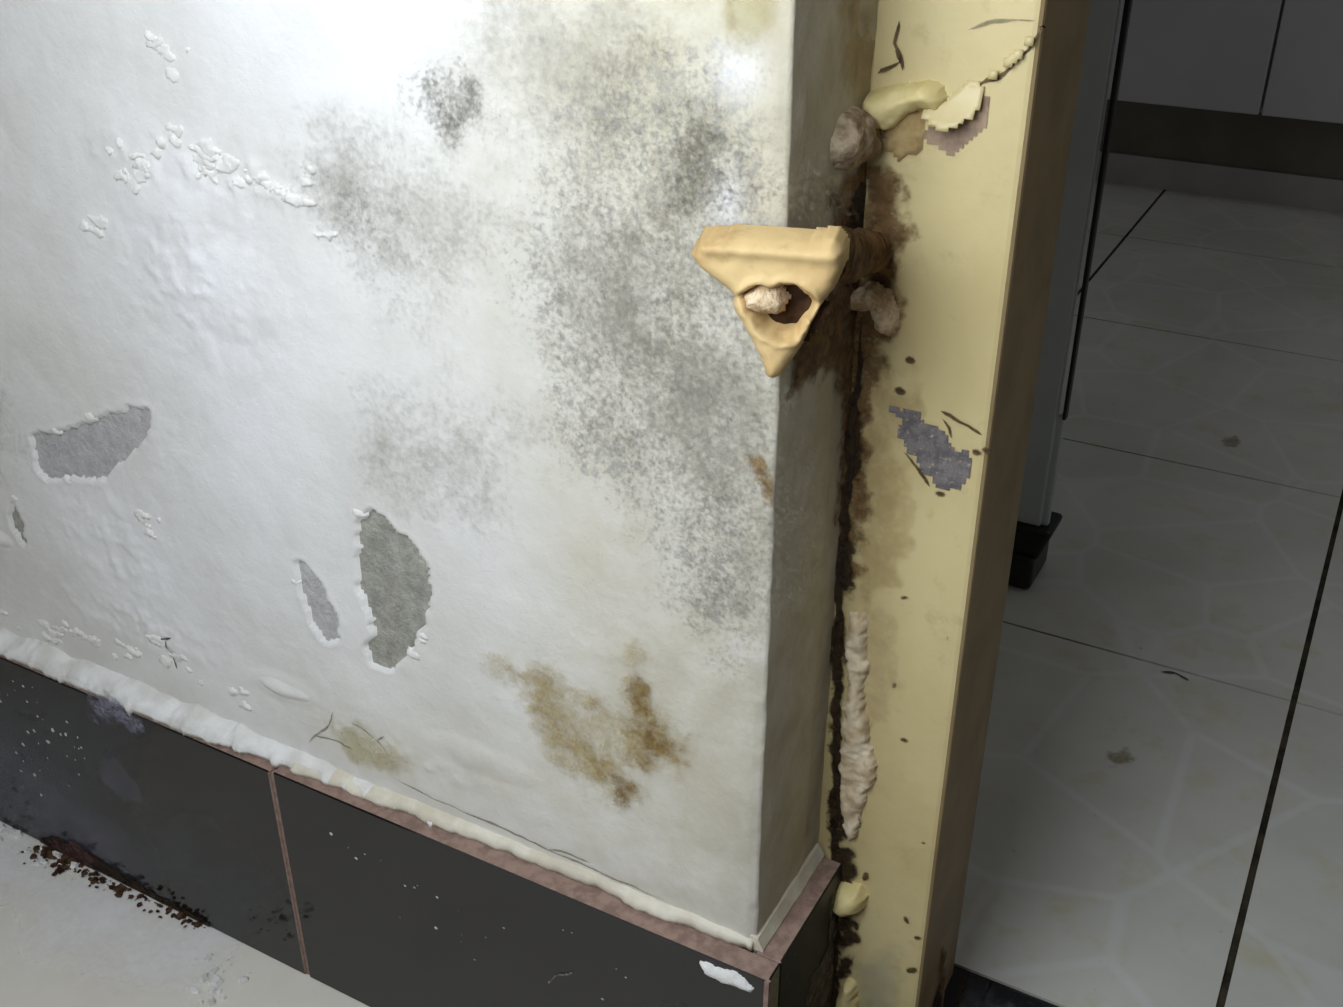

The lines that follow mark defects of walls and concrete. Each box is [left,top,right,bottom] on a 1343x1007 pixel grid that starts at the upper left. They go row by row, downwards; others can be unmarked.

peeling [921,80,990,156]
spalling [34,406,151,485]
water stain [749,457,773,499]
water stain [787,162,913,884]
peeling [889,387,991,496]
spalling [291,560,341,641]
spalling [352,508,432,669]
corrosion [39,833,209,927]
water stain [831,916,860,1007]